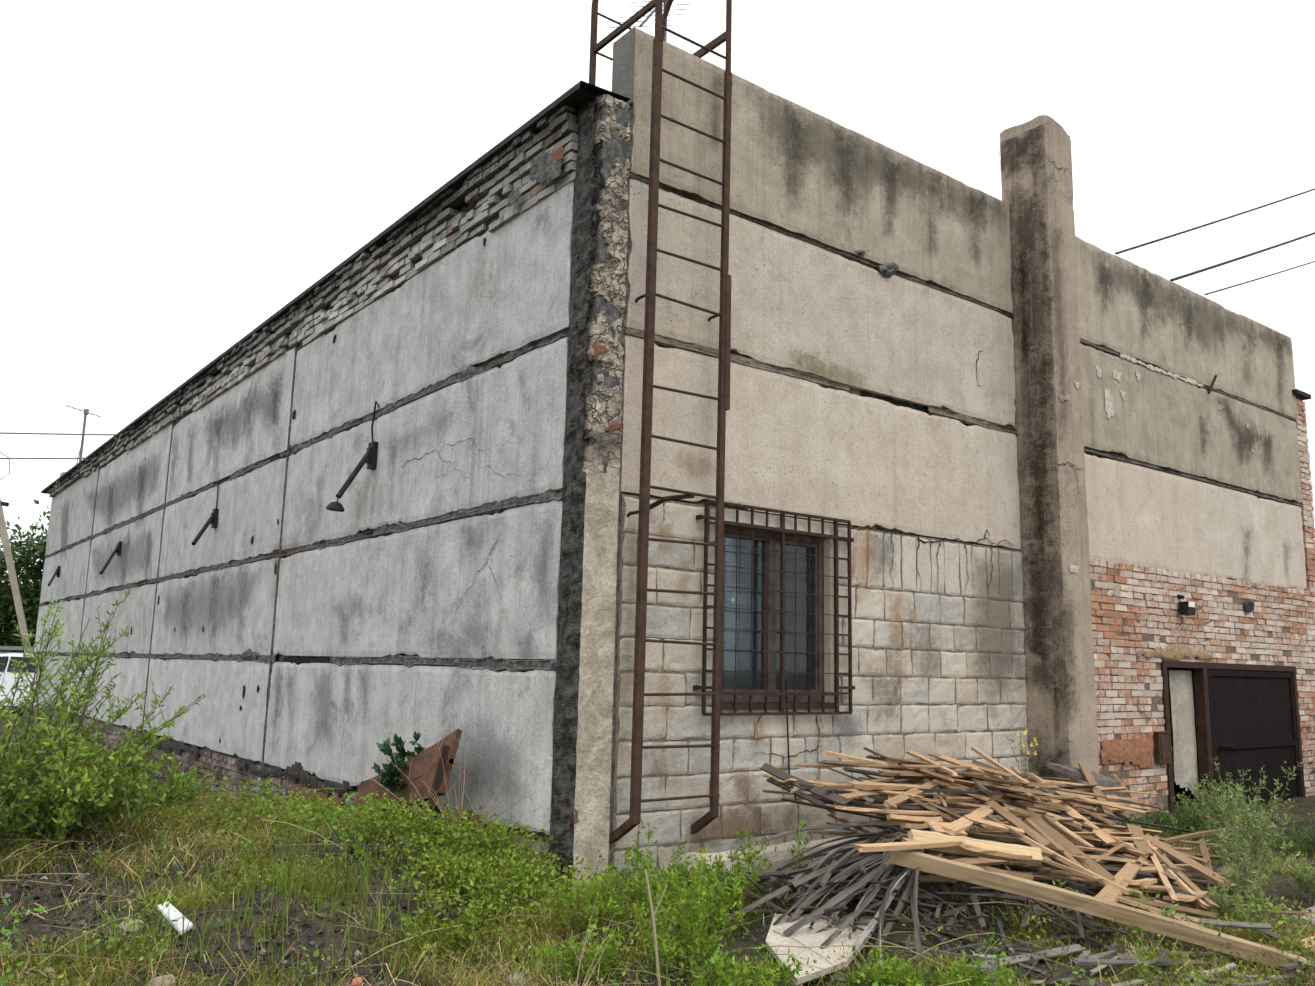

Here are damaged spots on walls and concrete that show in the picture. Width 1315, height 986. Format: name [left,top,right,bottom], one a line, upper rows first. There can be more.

damp [999,125,1045,185]
spalling [594,139,605,230]
peeling [1096,366,1141,419]
damp [1120,354,1203,387]
flaking render [608,422,623,434]
crack [401,438,518,484]